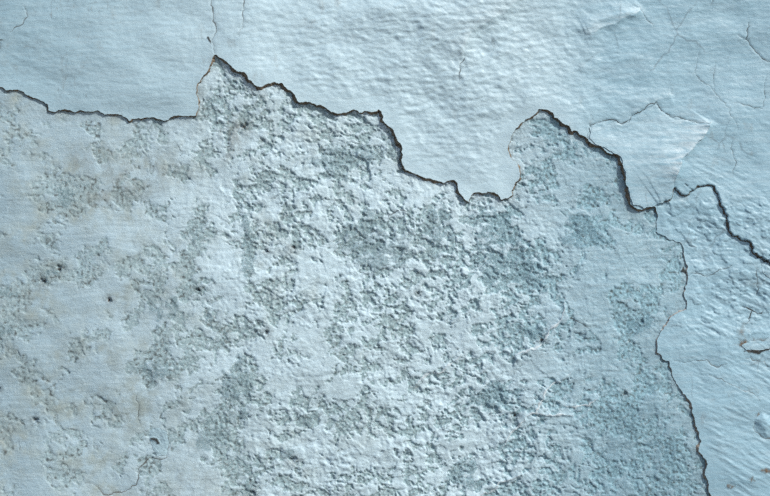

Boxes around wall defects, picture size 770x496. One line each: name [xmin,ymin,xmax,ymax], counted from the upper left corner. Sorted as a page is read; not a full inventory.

crack [587,101,696,138]
spalling [315,147,354,179]
spalling [356,144,377,165]
peeling [589,103,711,208]
spalling [428,210,450,222]
spalling [241,214,255,278]
spalling [349,238,389,275]
spalling [429,226,454,242]
spalling [521,326,545,339]
spalling [468,380,509,408]
peeling [149,427,169,456]
spalling [446,461,483,489]